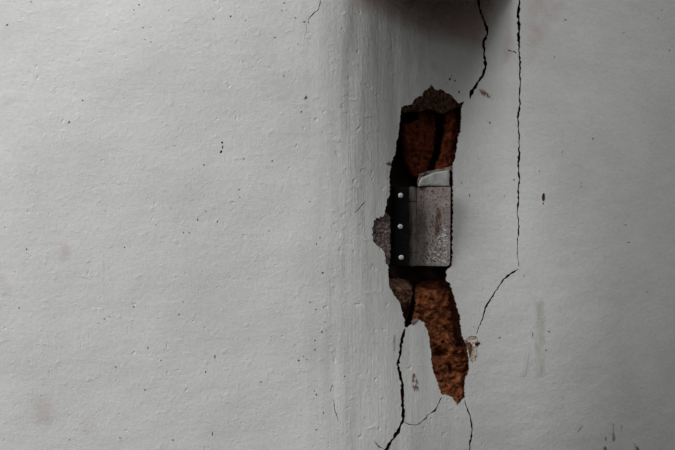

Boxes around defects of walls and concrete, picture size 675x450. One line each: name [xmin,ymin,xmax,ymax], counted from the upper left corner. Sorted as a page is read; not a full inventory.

crack [469,0,488,99]
crack [476,0,521,334]
flaking render [372,75,480,405]
crack [374,329,442,450]
crack [464,400,473,450]